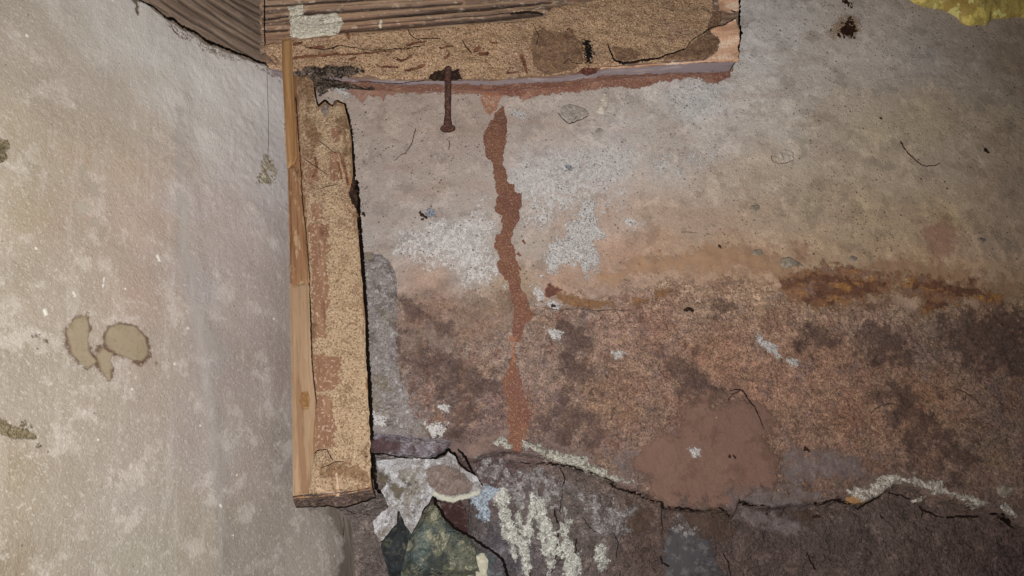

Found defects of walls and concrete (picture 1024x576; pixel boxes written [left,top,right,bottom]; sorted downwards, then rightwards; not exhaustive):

damp [65,315,152,381]
rust [345,69,733,453]
damp [392,139,1024,576]
rust [779,259,1003,315]
crack [433,496,509,576]
spalling [337,436,1024,576]